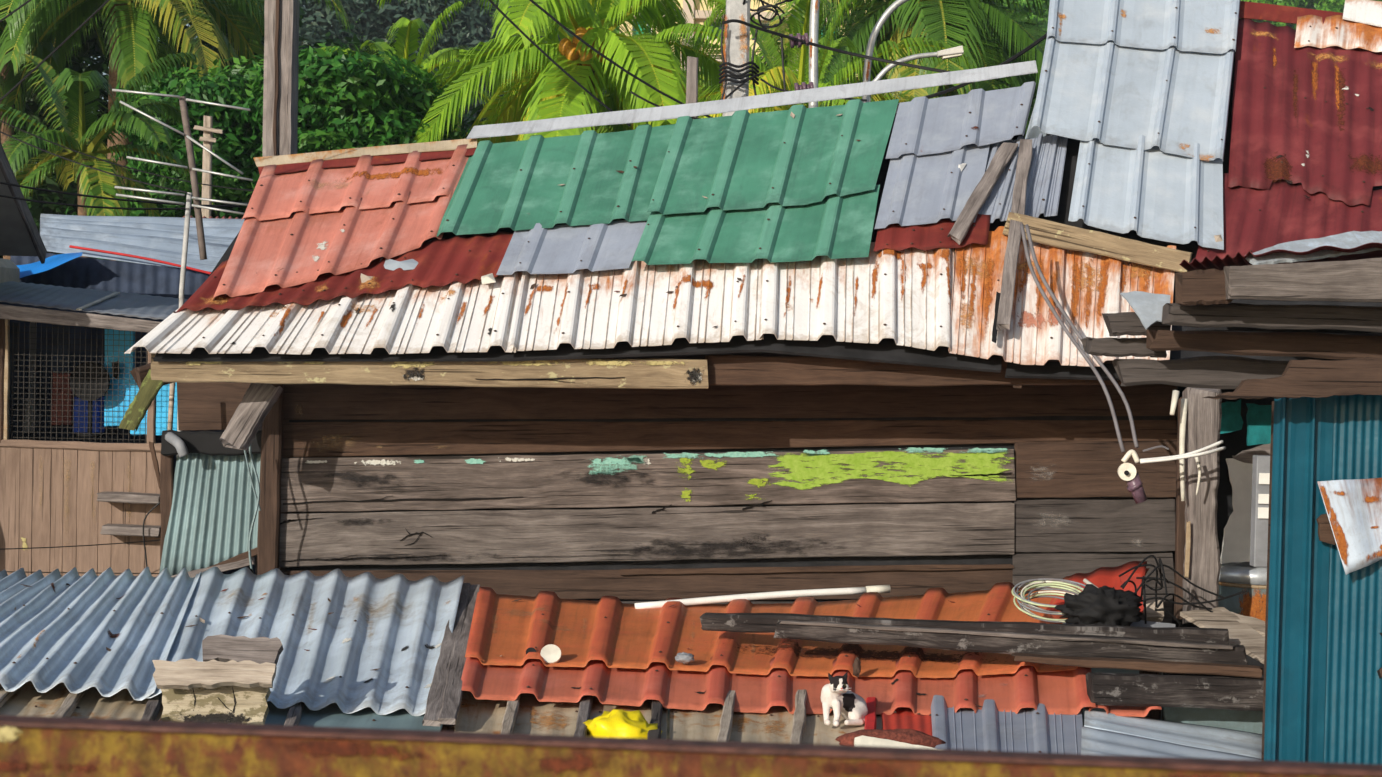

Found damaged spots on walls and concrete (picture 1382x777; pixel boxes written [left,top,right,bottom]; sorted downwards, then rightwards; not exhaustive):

corrosion [1292,54,1346,131]
corrosion [345,167,442,182]
corrosion [271,307,291,335]
corrosion [340,304,378,328]
corrosion [525,283,568,326]
corrosion [673,274,713,309]
corrosion [854,248,994,330]
corrosion [1017,259,1157,335]
corrosion [1316,486,1348,565]
corrosion [291,740,424,761]
corrosion [539,753,602,774]